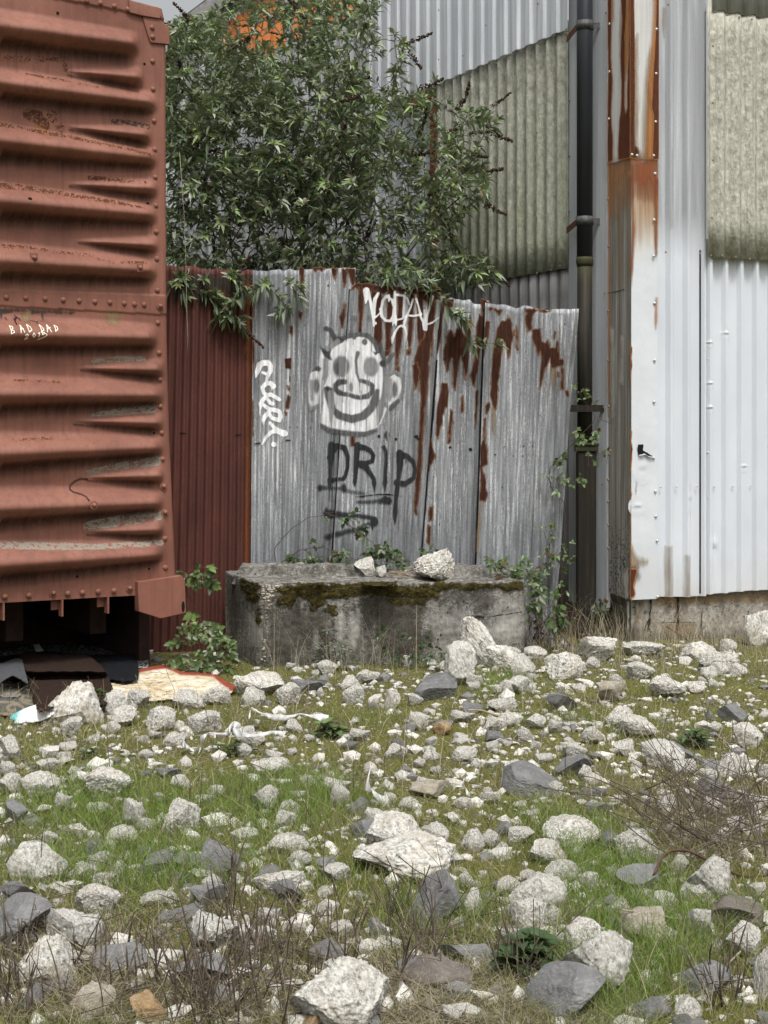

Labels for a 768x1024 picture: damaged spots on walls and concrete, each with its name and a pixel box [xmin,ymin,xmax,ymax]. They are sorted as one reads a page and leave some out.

rust [607,0,659,407]
rust [171,273,255,563]
rust [298,267,569,552]
rust [624,549,645,599]